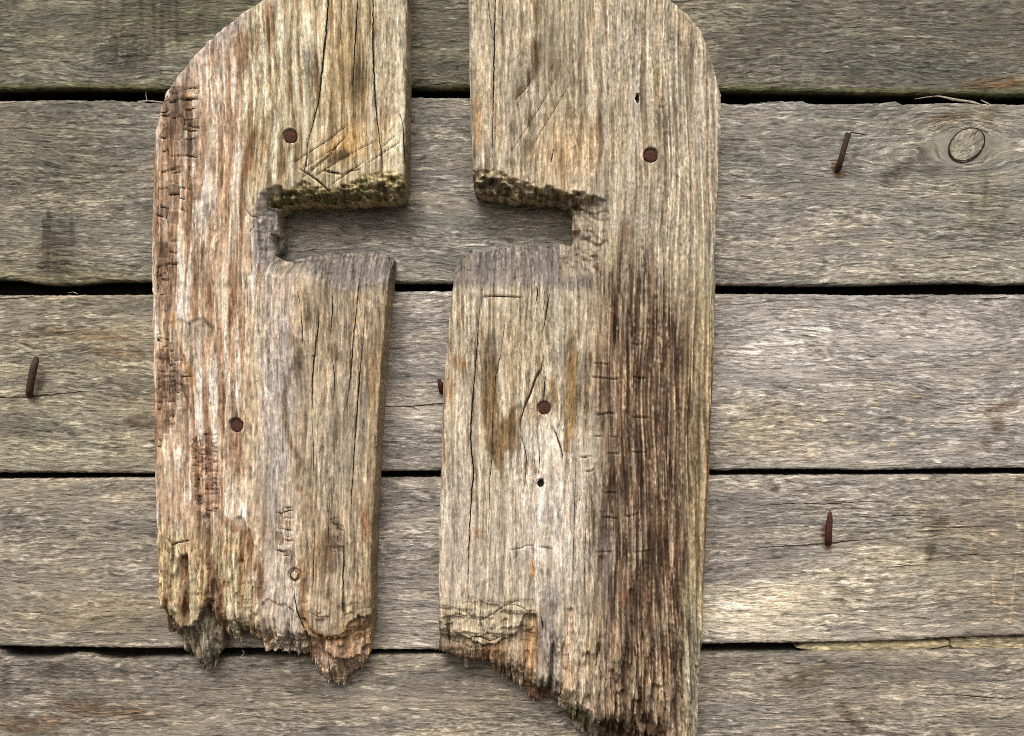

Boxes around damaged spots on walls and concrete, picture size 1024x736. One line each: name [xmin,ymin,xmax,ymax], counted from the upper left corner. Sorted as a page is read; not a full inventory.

crack [303,0,406,195]
damp [612,219,627,265]
crack [276,281,365,627]
crack [468,284,510,572]
damp [592,268,693,718]